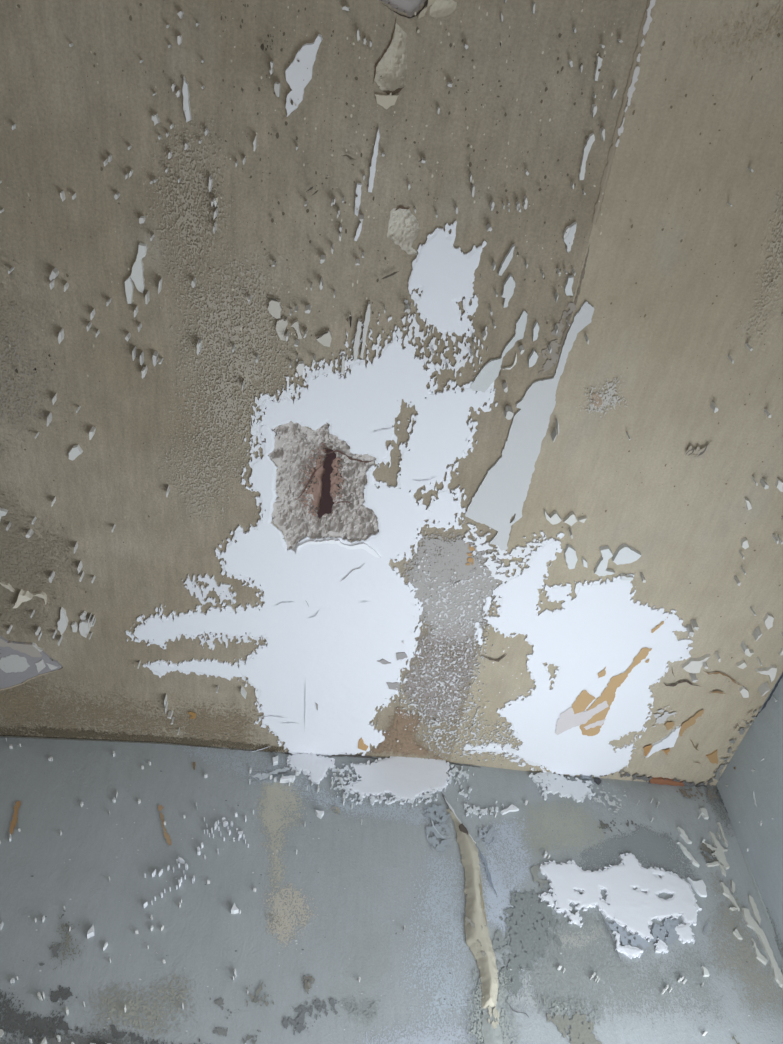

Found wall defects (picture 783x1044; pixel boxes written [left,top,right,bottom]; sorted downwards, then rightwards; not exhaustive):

peeling [285,34,322,117]
spalling [387,208,420,255]
peeling [125,243,147,304]
peeling [498,244,515,308]
peeling [341,301,371,376]
corrosion [296,443,345,522]
spalling [268,422,379,550]
peeling [564,544,642,581]
peeling [0,636,62,689]
water stain [39,910,85,970]
water stain [0,965,232,1044]
water stain [283,973,381,1035]